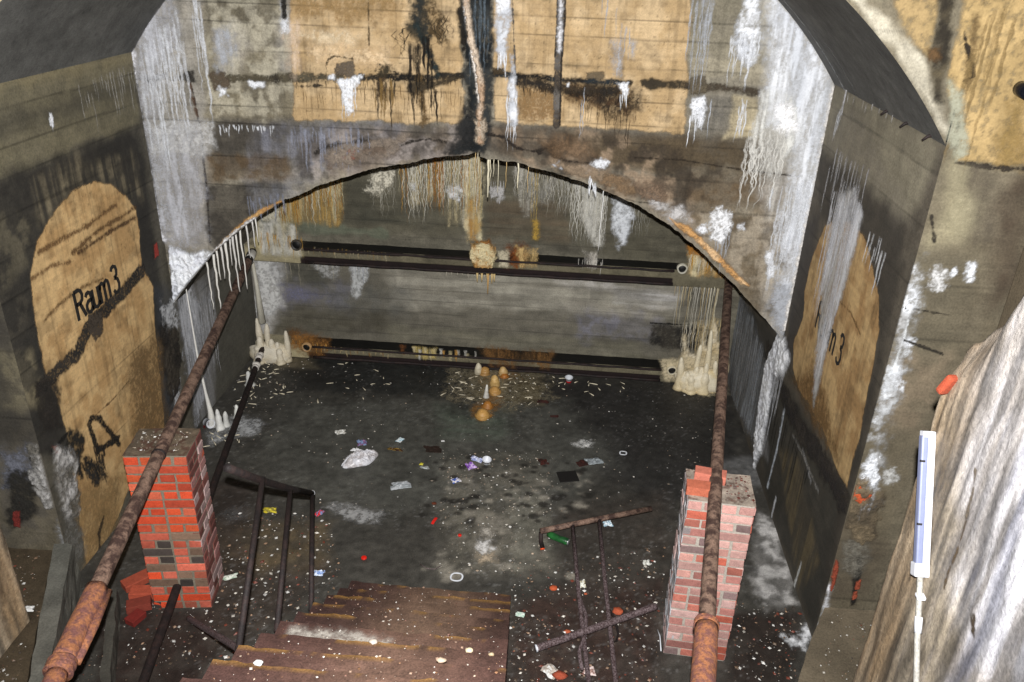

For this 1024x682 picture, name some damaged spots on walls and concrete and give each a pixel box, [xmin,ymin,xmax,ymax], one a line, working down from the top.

efflorescence [123,0,274,244]
leakage [282,0,884,404]
efflorescence [860,285,919,511]
efflorescence [930,262,976,292]